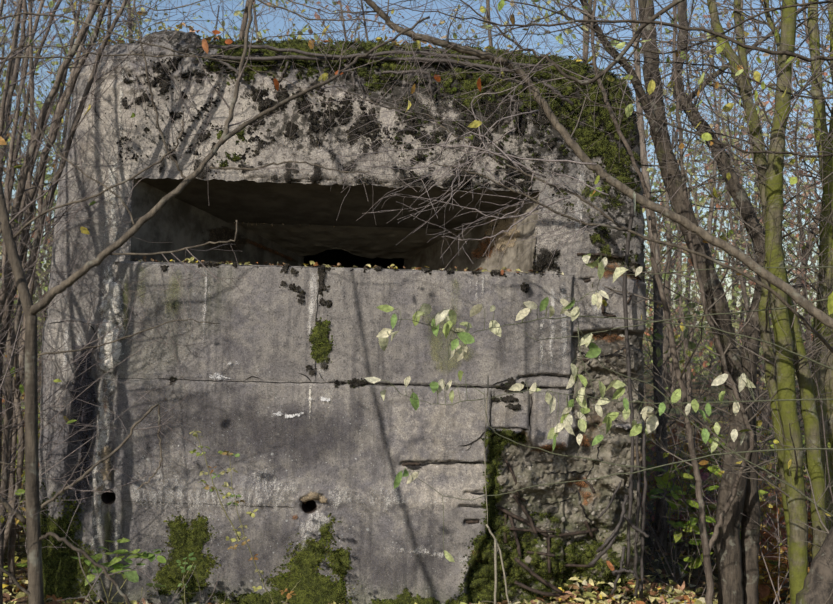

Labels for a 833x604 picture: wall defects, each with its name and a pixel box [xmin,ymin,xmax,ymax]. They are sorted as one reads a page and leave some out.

damp [100,267,124,333]
damp [91,363,115,554]
damp [110,519,119,558]
crack [115,345,631,527]
spalling [484,330,645,604]